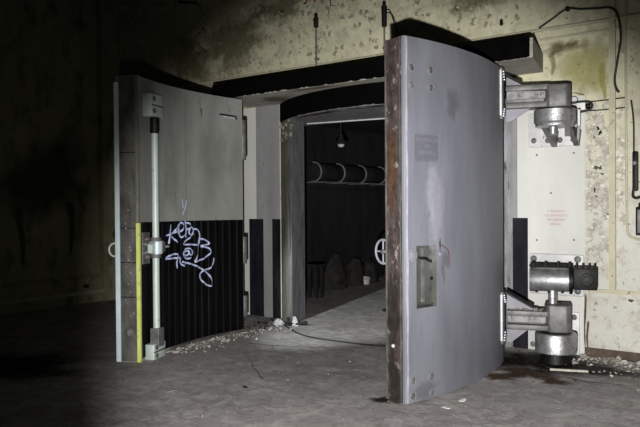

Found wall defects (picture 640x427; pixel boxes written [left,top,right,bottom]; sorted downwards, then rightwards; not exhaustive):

rust [388,280,398,344]
rust [488,366,568,385]